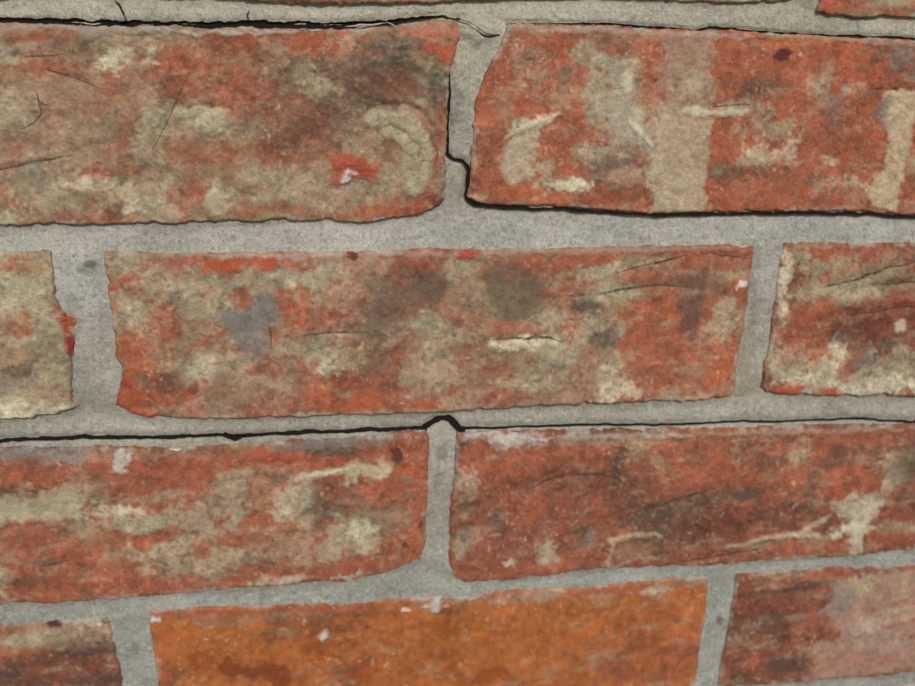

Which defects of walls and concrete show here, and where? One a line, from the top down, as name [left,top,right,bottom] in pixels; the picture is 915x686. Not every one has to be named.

crack [0,0,500,37]
crack [521,22,915,40]
crack [446,74,495,208]
crack [0,415,915,442]